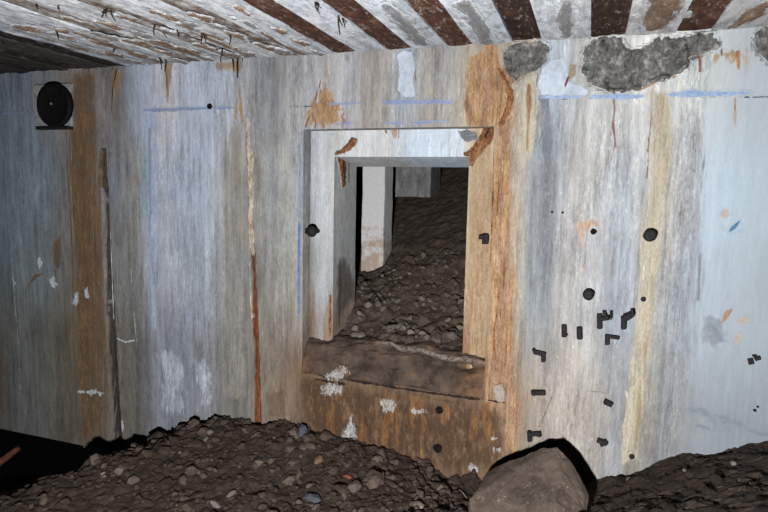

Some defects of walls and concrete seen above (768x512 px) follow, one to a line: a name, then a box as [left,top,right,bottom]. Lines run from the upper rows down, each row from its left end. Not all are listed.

rust [9,9,351,448]
damp [261,365,516,479]
rust [461,44,523,456]
spalling [501,31,722,96]